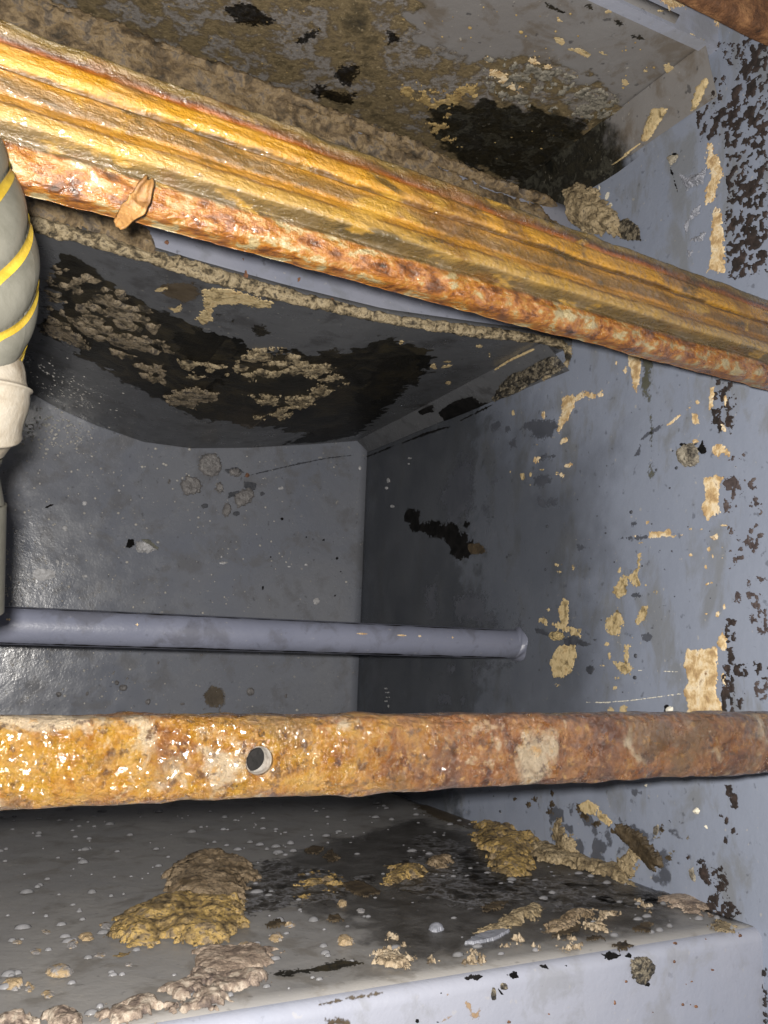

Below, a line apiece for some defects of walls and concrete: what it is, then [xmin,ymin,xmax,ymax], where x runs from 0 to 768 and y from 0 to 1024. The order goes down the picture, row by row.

rust [114,174,155,230]
rust [52,0,622,185]
leakage [426,98,625,205]
peeling [679,35,768,280]
leakage [22,358,130,490]
leakage [37,253,437,445]
rust [418,357,565,421]
peeling [600,378,764,690]
peeling [683,576,768,712]
leakage [243,800,679,958]
rust [576,804,616,834]
spalling [552,921,656,987]